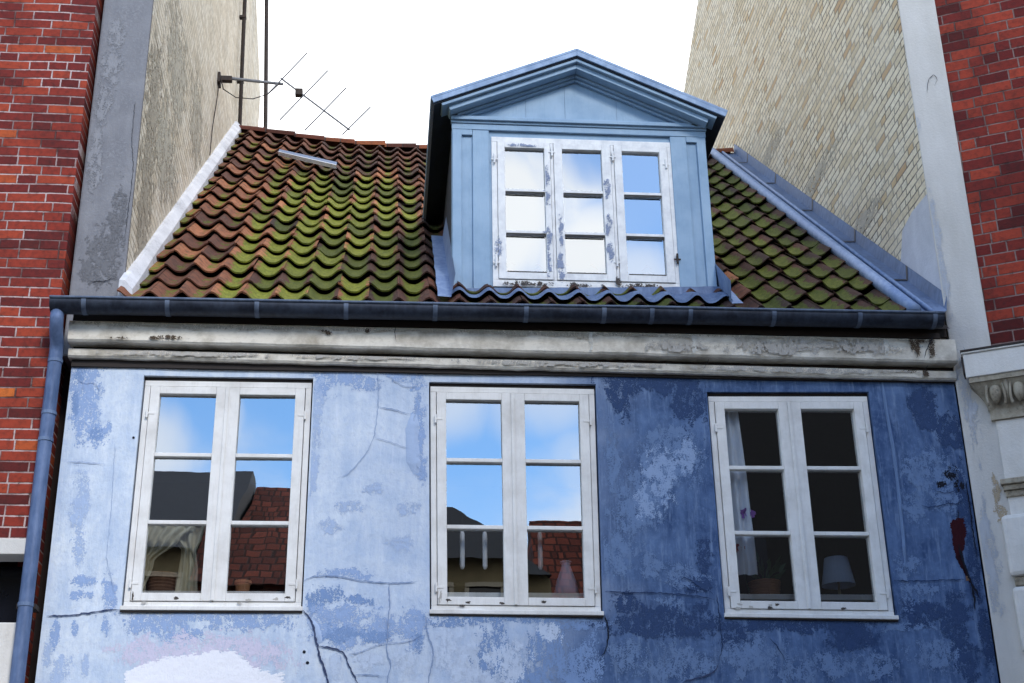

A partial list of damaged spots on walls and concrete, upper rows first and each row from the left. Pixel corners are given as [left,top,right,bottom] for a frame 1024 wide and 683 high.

damp [72,321,937,358]
crack [338,372,422,478]
damp [411,179,1008,683]
crack [49,457,120,617]
peeling [602,418,716,611]
corrosion [950,517,970,583]
peeling [77,582,564,683]
crack [303,575,434,683]